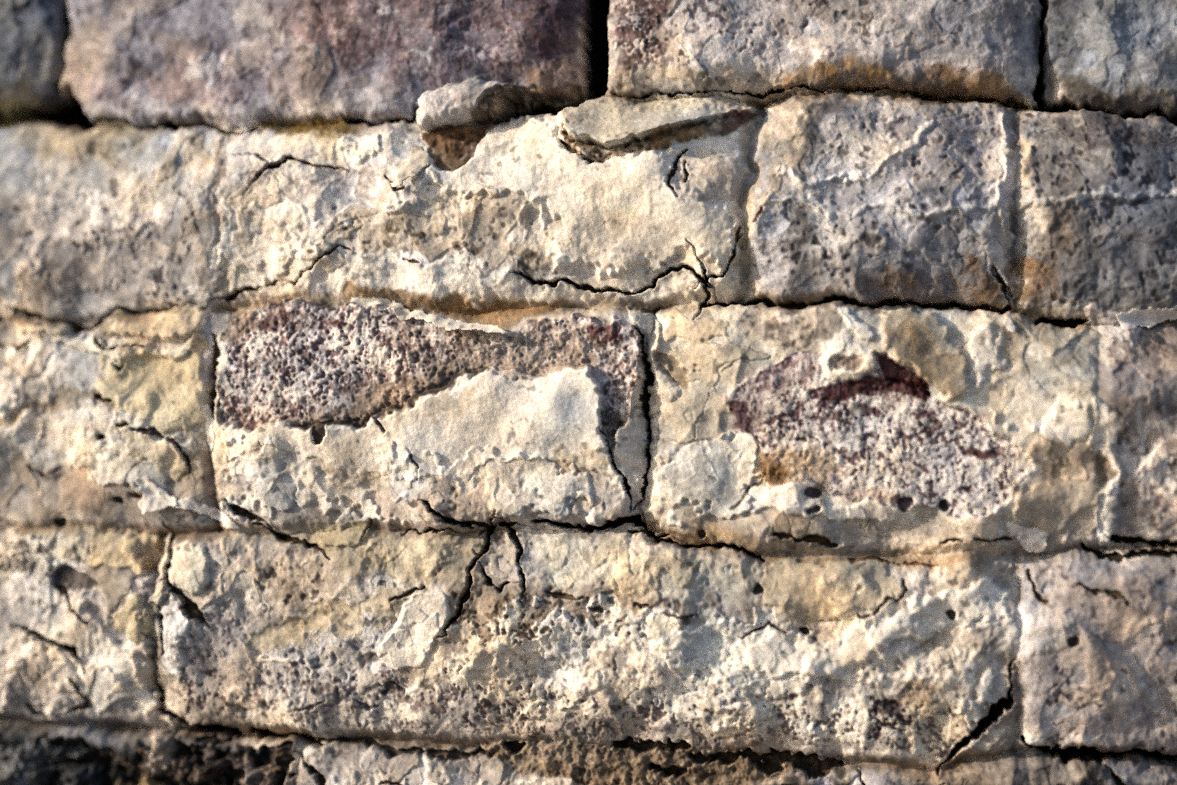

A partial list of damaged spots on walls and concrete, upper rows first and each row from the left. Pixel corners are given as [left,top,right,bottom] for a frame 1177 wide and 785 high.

crack [240,154,340,184]
spalling [391,83,754,187]
crack [519,207,763,317]
spalling [97,297,681,529]
crack [600,328,655,509]
spalling [724,307,1110,553]
crack [409,454,604,636]
crack [154,529,220,728]
crack [633,603,693,620]
crack [937,663,1013,769]
crack [1111,771,1125,785]